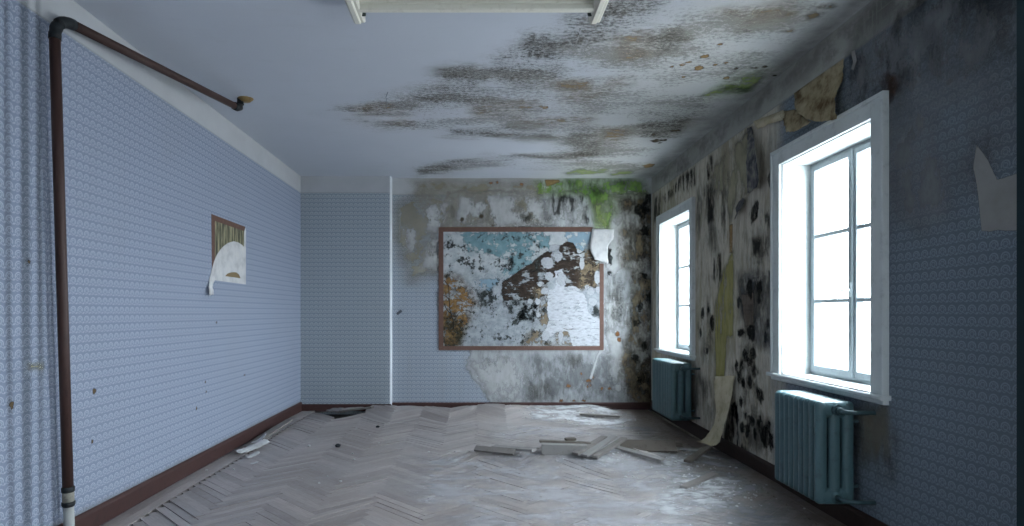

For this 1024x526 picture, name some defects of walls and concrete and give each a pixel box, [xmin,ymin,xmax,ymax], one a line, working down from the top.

mould [417,0,689,114]
mould [451,117,625,158]
flaking render [441,180,651,402]
water stain [399,156,773,451]
peeling [697,376,735,446]